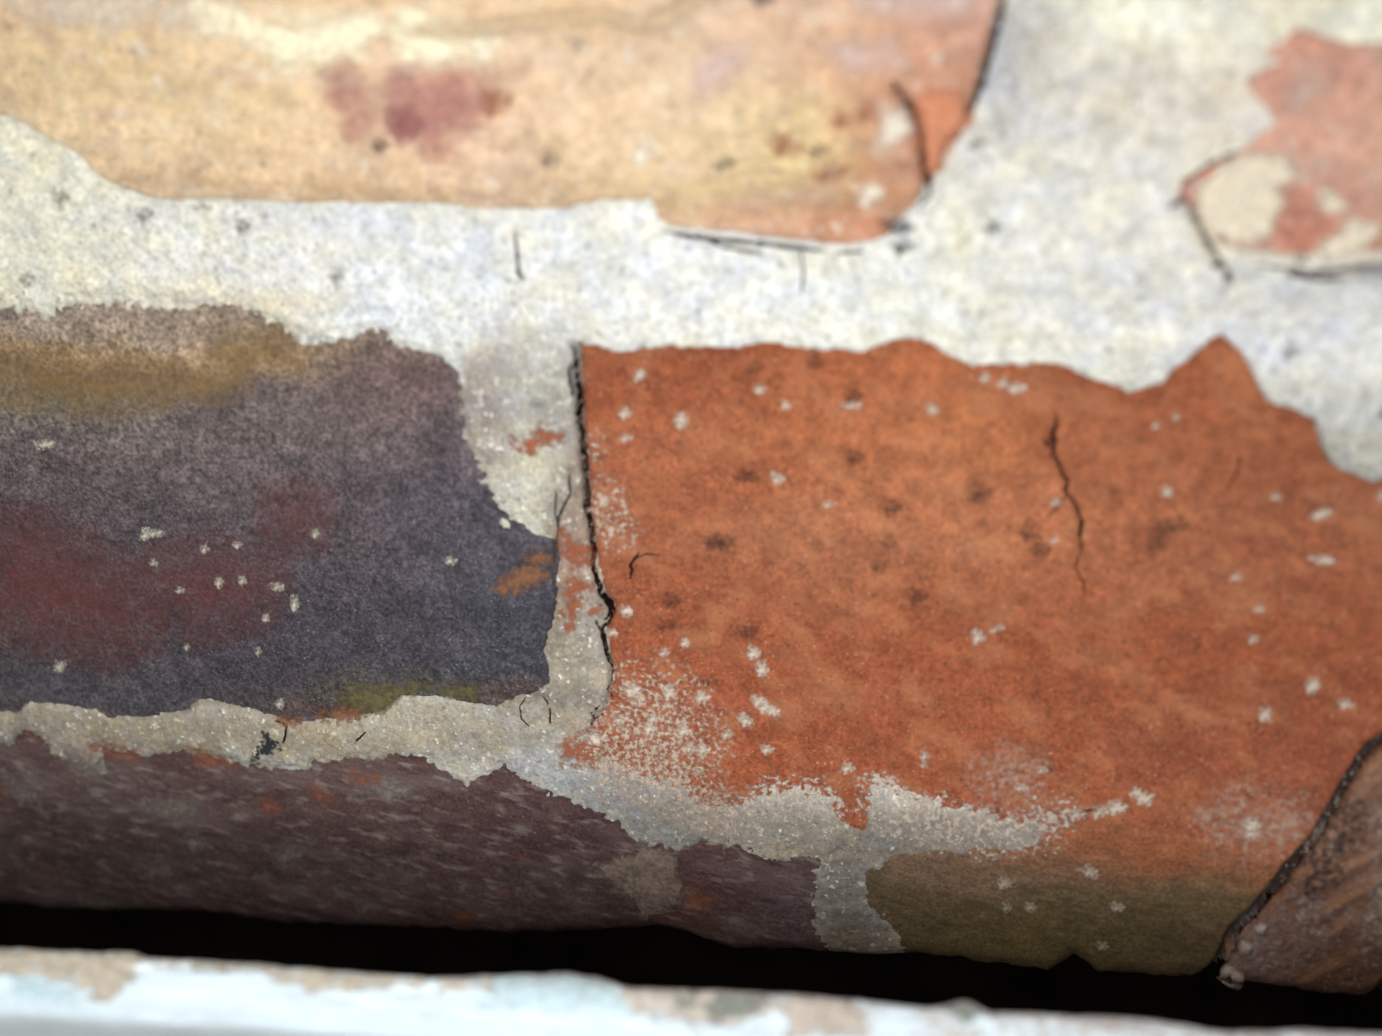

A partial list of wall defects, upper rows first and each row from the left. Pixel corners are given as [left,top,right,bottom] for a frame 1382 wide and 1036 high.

crack [1169,150,1382,290]
crack [552,344,660,726]
crack [1045,410,1085,595]
peeling [0,948,864,1036]